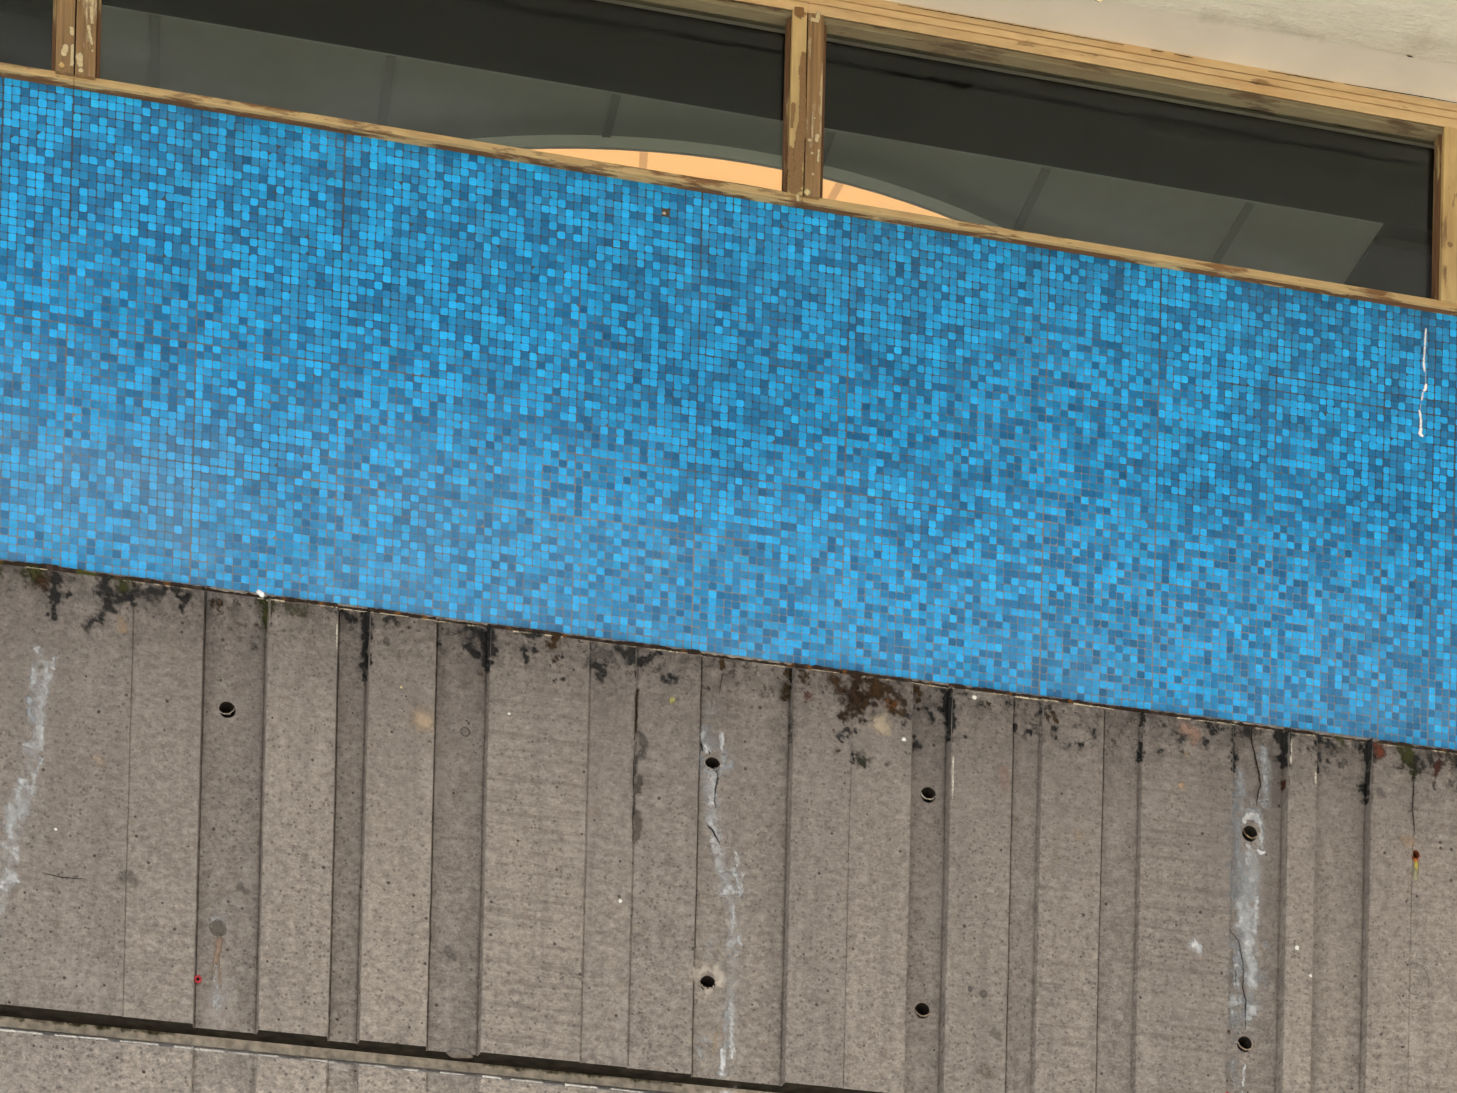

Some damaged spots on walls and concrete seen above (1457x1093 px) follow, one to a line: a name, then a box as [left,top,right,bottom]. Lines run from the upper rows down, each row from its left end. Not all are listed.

water stain [0,565,63,621]
water stain [82,575,191,632]
water stain [993,693,1114,723]
water stain [0,647,55,915]
crack [1251,727,1261,806]
water stain [699,730,744,953]
water stain [1177,717,1337,1022]
water stain [0,1029,278,1057]
water stain [693,964,735,1093]
crack [1229,920,1247,1030]